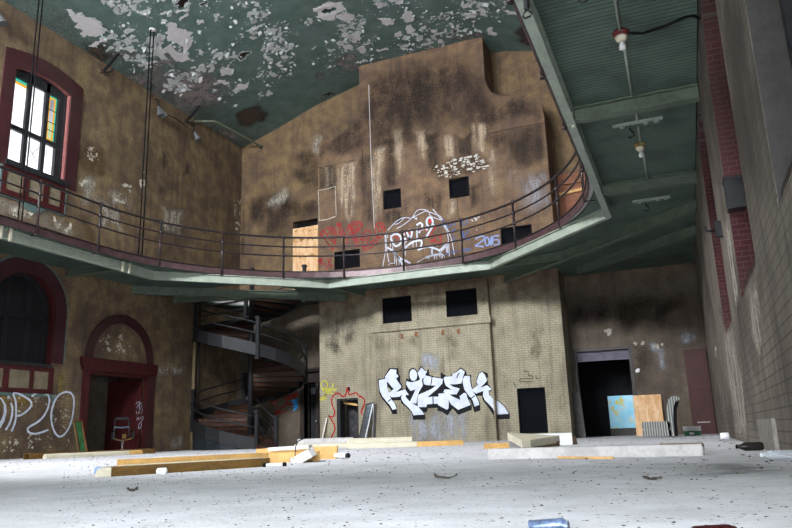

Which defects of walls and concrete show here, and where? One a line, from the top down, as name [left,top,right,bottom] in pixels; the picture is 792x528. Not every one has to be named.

peeling [304,0,517,69]
flaking render [516,27,529,45]
peeling [67,0,299,126]
damp [325,131,403,219]
damp [418,124,494,166]
spalling [432,154,489,178]
damp [526,179,547,203]